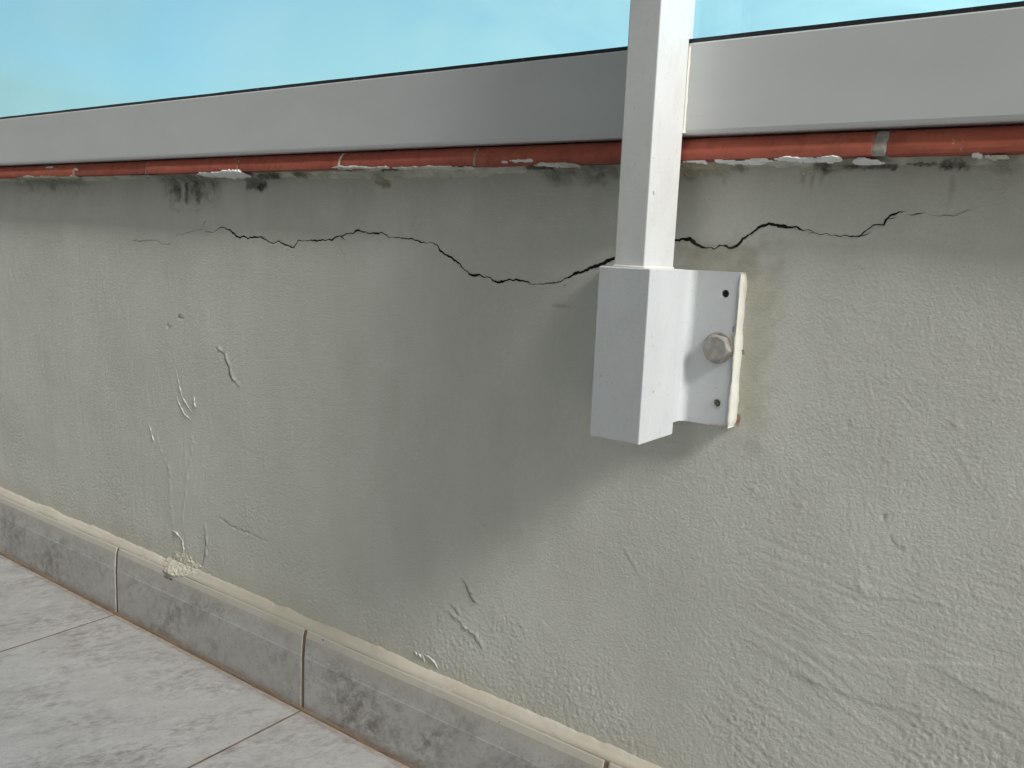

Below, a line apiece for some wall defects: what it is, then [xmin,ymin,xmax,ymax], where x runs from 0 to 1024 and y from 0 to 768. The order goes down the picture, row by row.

damp [815,160,969,173]
crack [132,220,615,285]
crack [675,210,972,250]
peeling [163,530,202,580]